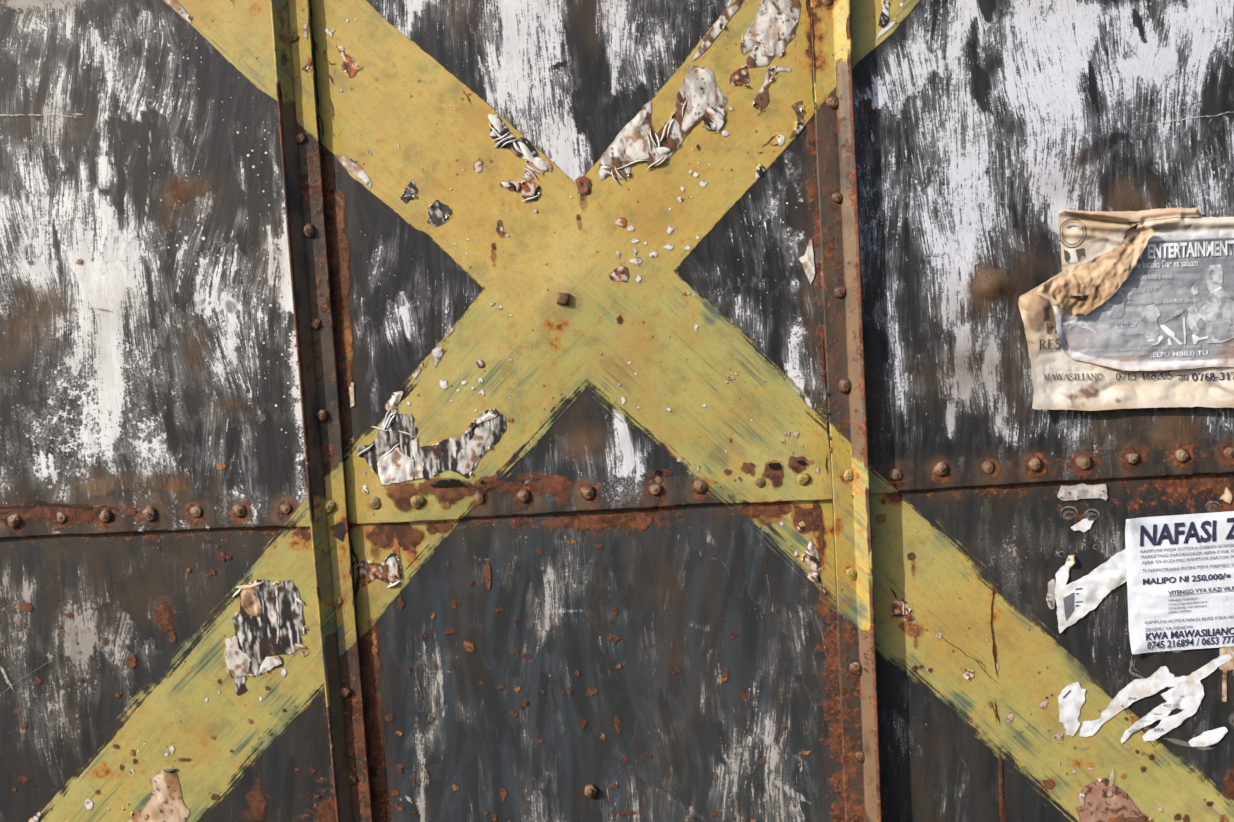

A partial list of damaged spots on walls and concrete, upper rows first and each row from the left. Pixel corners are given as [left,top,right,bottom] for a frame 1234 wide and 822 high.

peeling [488,113,552,213]
peeling [570,0,806,283]
corrosion [332,196,352,392]
peeling [357,327,513,495]
peeling [352,553,402,588]
corrosion [370,473,580,562]
corrosion [598,511,652,530]
corrosion [724,456,813,487]
corrosion [738,501,823,555]
peeling [205,579,308,702]
corrosion [364,621,402,749]
peeling [84,745,190,822]